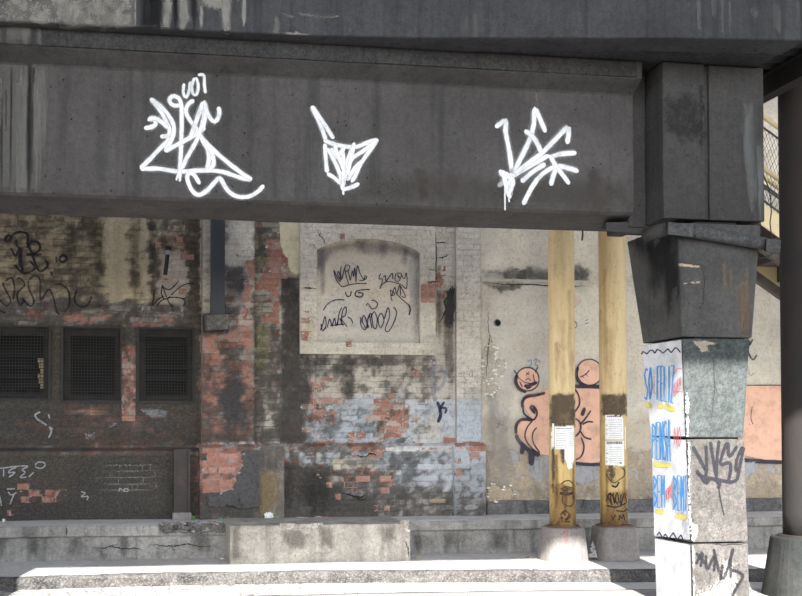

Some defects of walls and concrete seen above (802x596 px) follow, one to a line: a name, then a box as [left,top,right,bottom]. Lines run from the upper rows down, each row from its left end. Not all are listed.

damp [143,0,161,27]
damp [1,69,12,183]
flaking render [265,222,300,279]
spalling [121,346,136,421]
peeling [300,398,348,416]
peeling [365,393,417,439]
flaking render [202,448,260,509]
crack [97,543,210,552]
spalling [158,521,225,534]